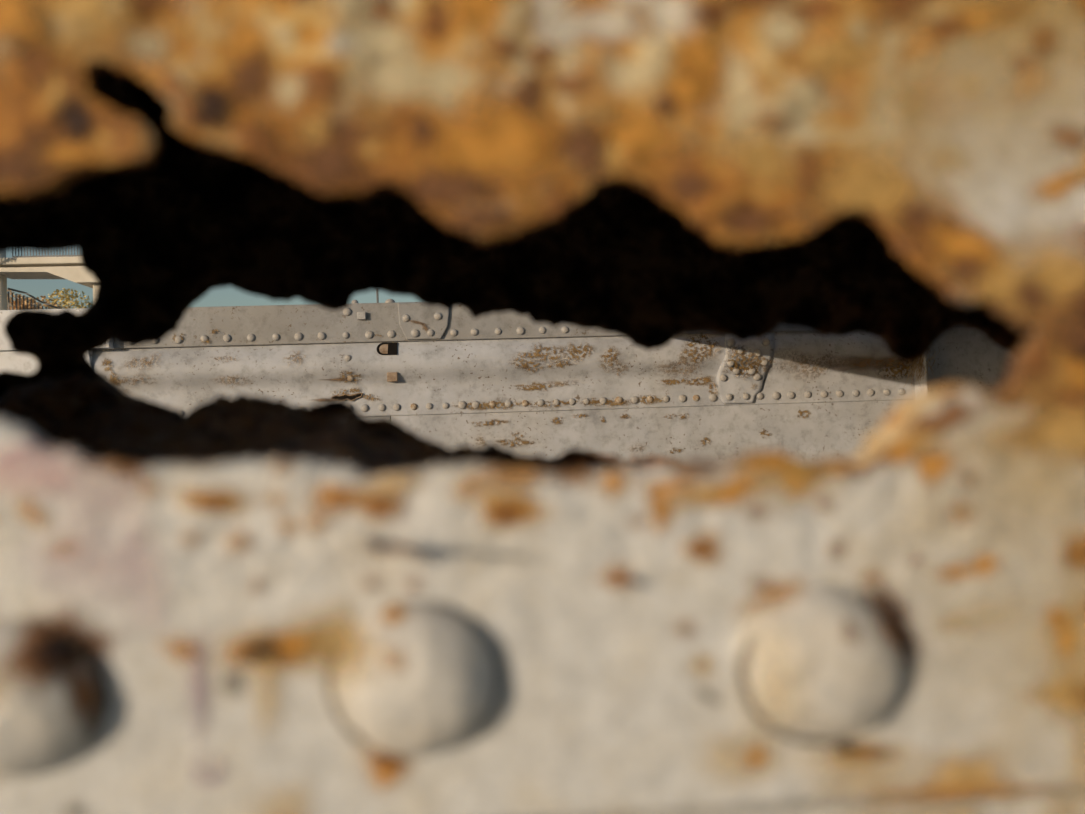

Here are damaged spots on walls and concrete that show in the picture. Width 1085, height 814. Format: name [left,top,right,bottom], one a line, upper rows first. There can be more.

peeling [328,0,463,100]
peeling [534,0,699,46]
peeling [766,18,801,45]
peeling [277,78,305,106]
peeling [721,57,819,125]
corrosion [0,0,1085,453]
peeling [849,382,966,465]
corrosion [186,491,232,509]
corrosion [317,476,410,518]
corrosion [484,491,534,526]
corrosion [649,453,810,531]
corrosion [9,618,109,744]